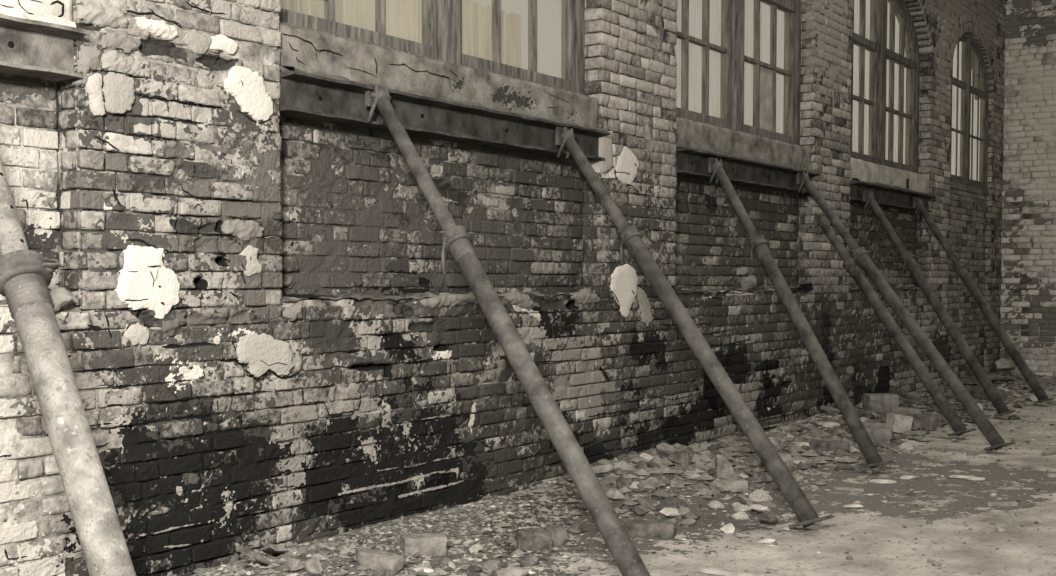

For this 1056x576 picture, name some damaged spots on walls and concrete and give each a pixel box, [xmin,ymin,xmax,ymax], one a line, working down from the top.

crack [0,0,64,17]
spalling [75,23,101,31]
spalling [139,37,239,71]
crack [281,33,458,90]
spalling [125,307,161,326]
damp [180,266,244,314]
damp [347,247,472,296]
damp [714,343,850,451]
damp [75,306,619,576]
damp [562,322,800,557]
damp [791,443,1056,521]
damp [53,514,89,576]